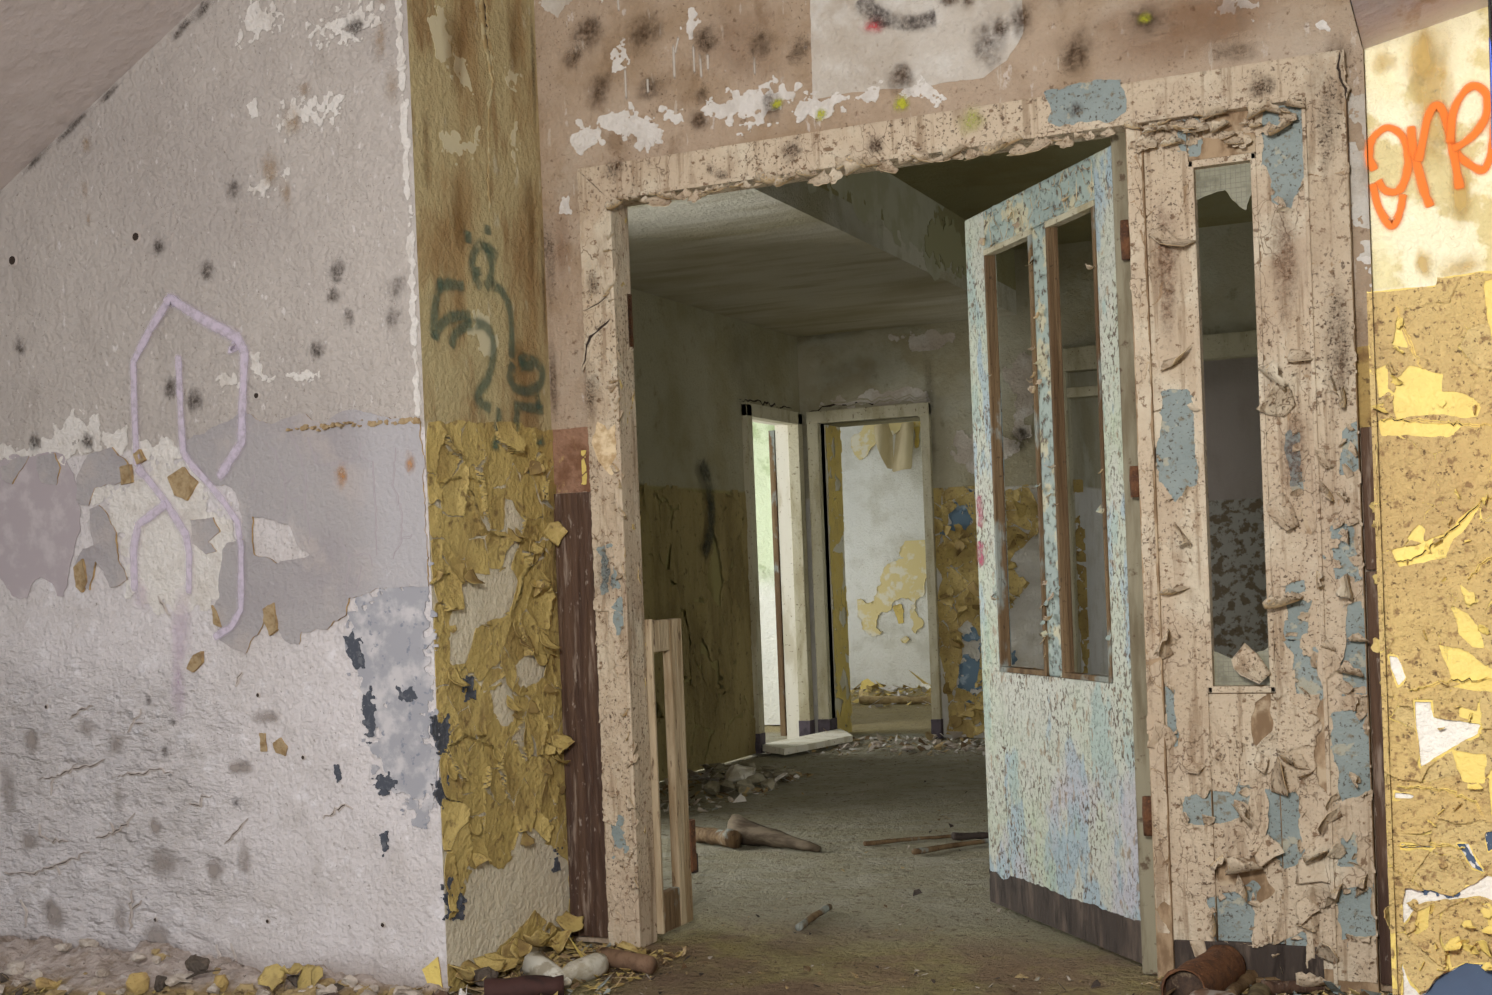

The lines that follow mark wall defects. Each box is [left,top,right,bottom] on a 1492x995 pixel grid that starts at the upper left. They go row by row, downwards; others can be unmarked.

damp [569,20,596,61]
damp [673,31,712,95]
damp [1065,44,1085,65]
peeling [1315,20,1331,32]
peeling [0,0,1127,942]
peeling [1124,55,1492,995]
peeling [422,899,584,992]